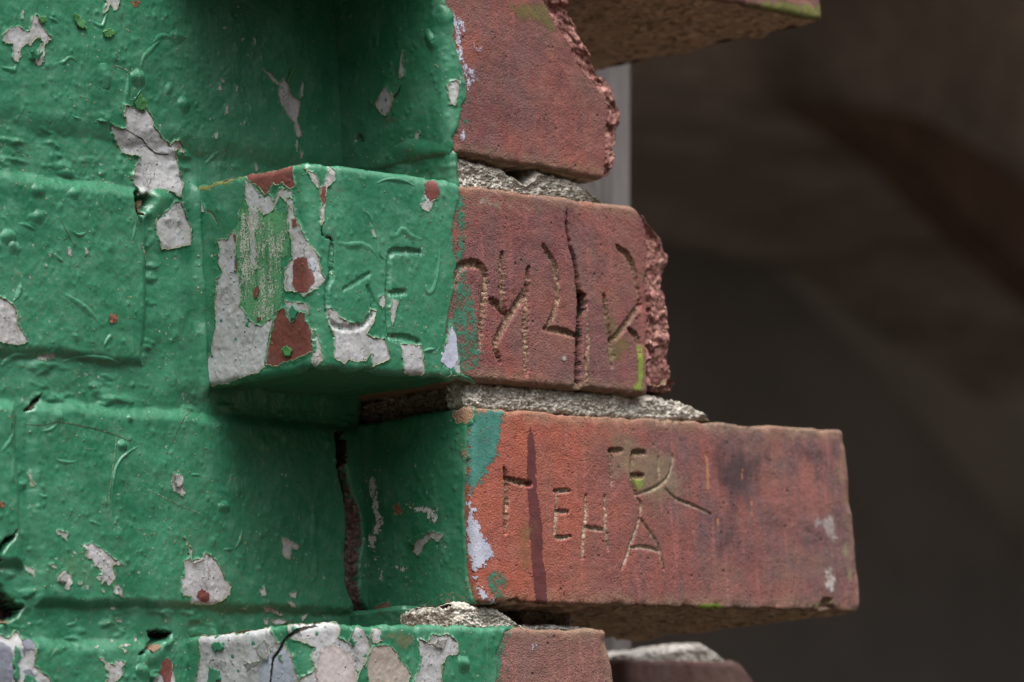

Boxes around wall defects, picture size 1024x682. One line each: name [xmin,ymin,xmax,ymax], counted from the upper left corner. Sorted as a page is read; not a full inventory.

peeling [0,9,54,67]
peeling [374,49,407,119]
peeling [109,90,194,253]
peeling [208,67,462,389]
peeling [0,294,57,363]
peeling [55,527,126,625]
peeling [179,533,233,609]
crack [269,624,317,682]
peeling [193,583,460,682]